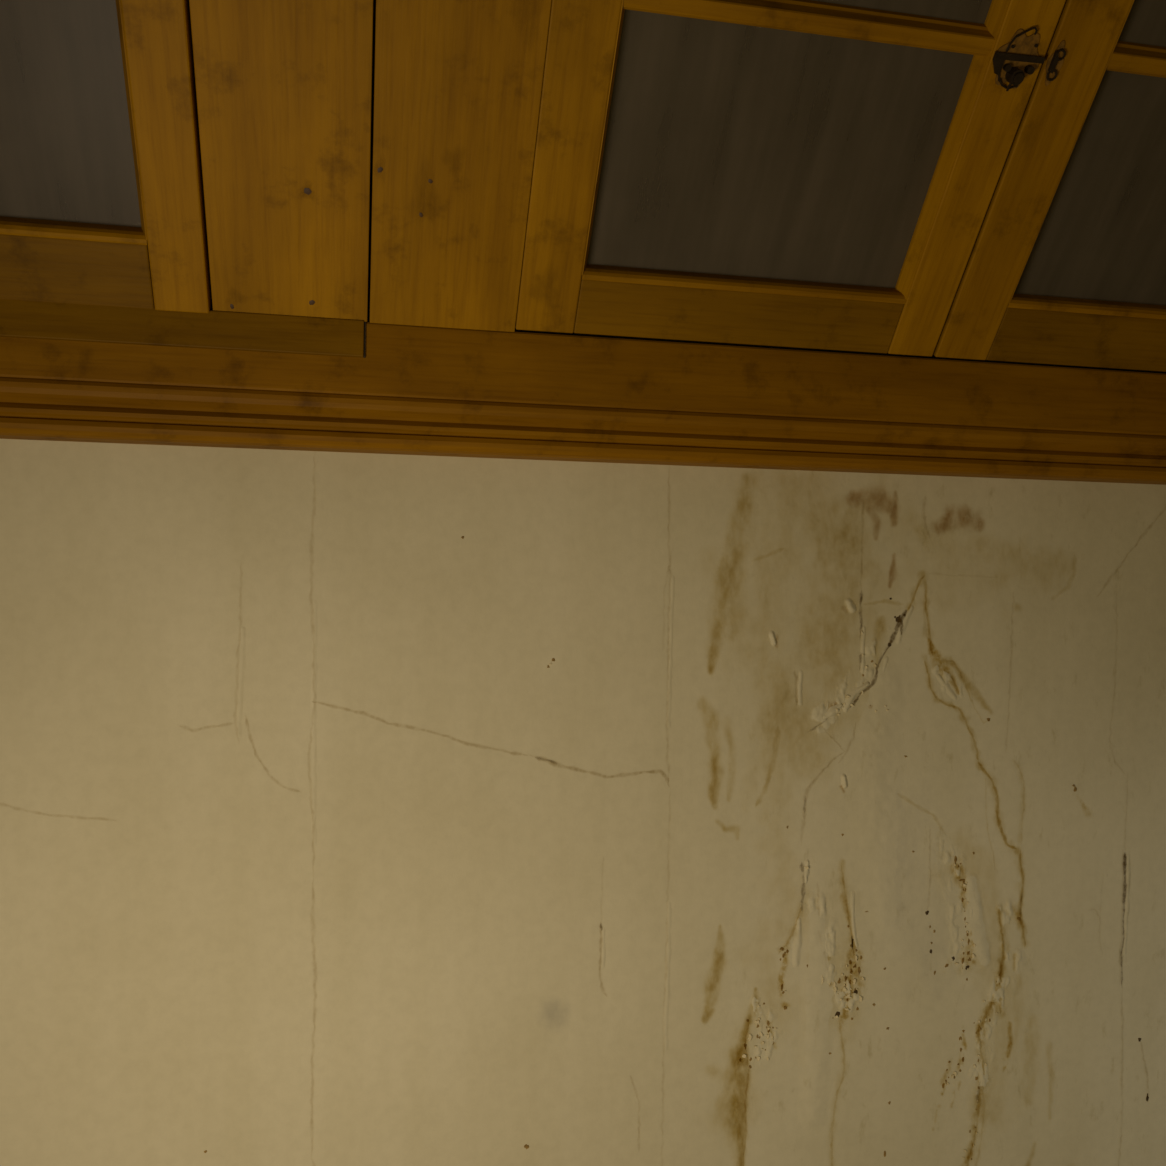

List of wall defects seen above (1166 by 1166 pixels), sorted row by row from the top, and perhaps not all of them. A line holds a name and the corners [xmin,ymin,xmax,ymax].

crack [796,598,914,719]
crack [791,917,803,968]